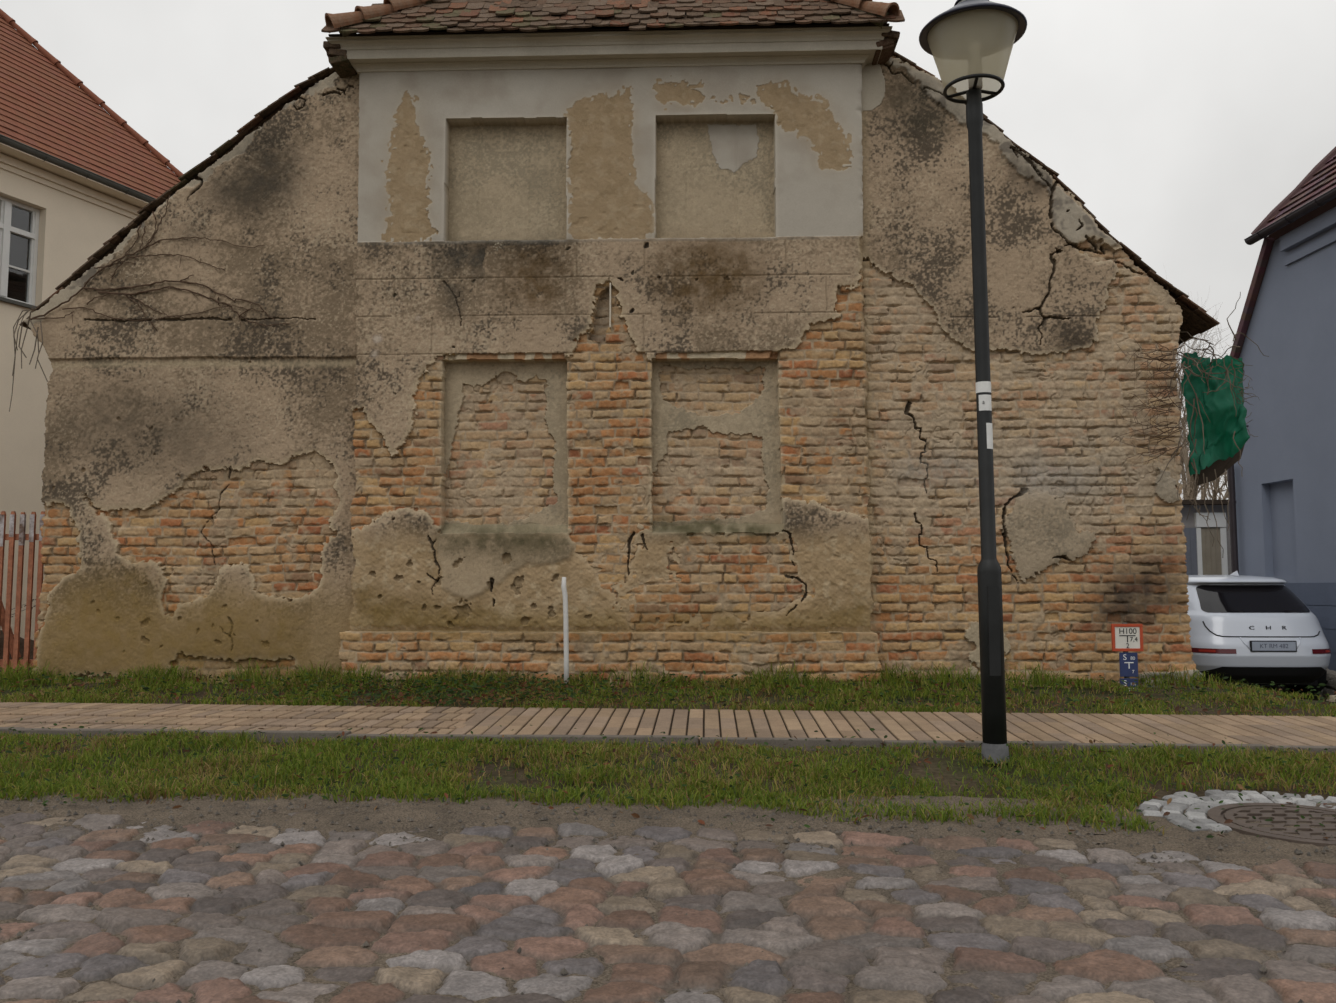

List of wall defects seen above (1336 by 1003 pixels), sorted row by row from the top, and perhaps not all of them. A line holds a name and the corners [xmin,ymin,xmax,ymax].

flaking render [381,90,439,242]
flaking render [564,85,657,250]
flaking render [653,75,854,171]
crack [1010,145,1144,345]
flaking render [0,192,1202,689]